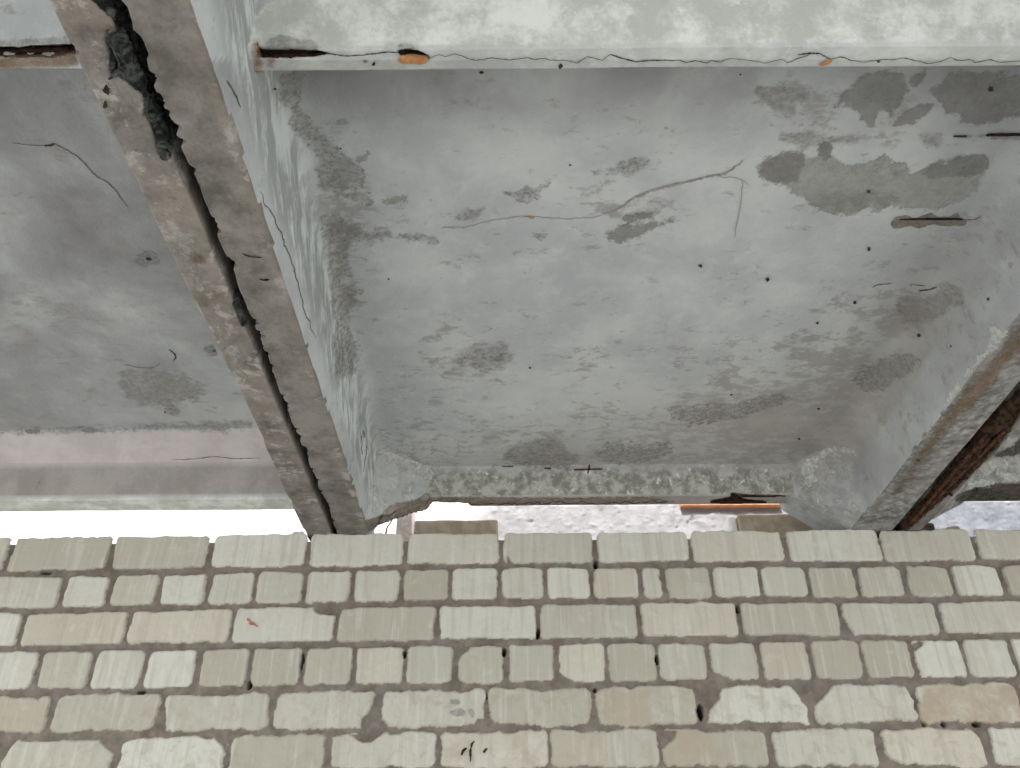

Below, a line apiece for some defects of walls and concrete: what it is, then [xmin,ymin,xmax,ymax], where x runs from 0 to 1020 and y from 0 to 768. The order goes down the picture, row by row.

leakage [835,70,1020,128]
crack [12,142,128,207]
crack [260,191,316,337]
crack [443,160,747,235]
leakage [608,213,673,244]
leakage [756,142,989,217]
spalling [891,213,983,229]
rust [897,332,1020,490]